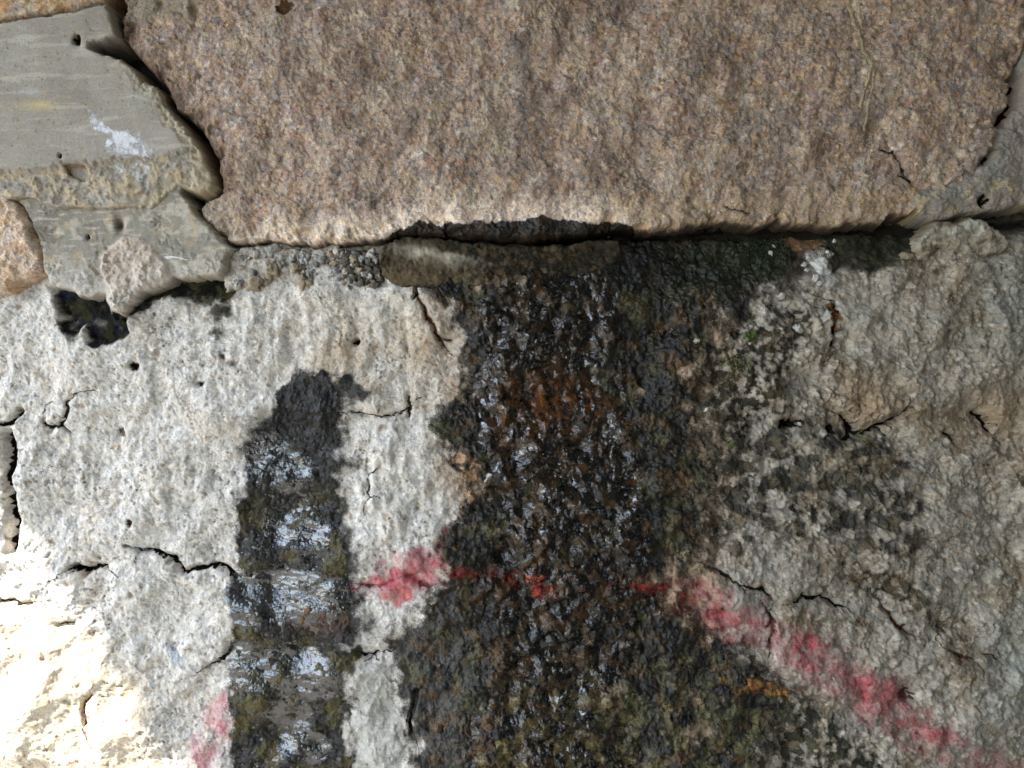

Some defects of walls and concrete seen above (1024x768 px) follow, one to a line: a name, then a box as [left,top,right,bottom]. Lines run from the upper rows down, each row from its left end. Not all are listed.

crack [413,287,454,357]
crack [338,396,422,421]
crack [828,399,911,441]
crack [942,410,1000,444]
crack [0,389,95,568]
damp [222,214,952,768]
crack [0,545,242,624]
crack [696,561,864,661]